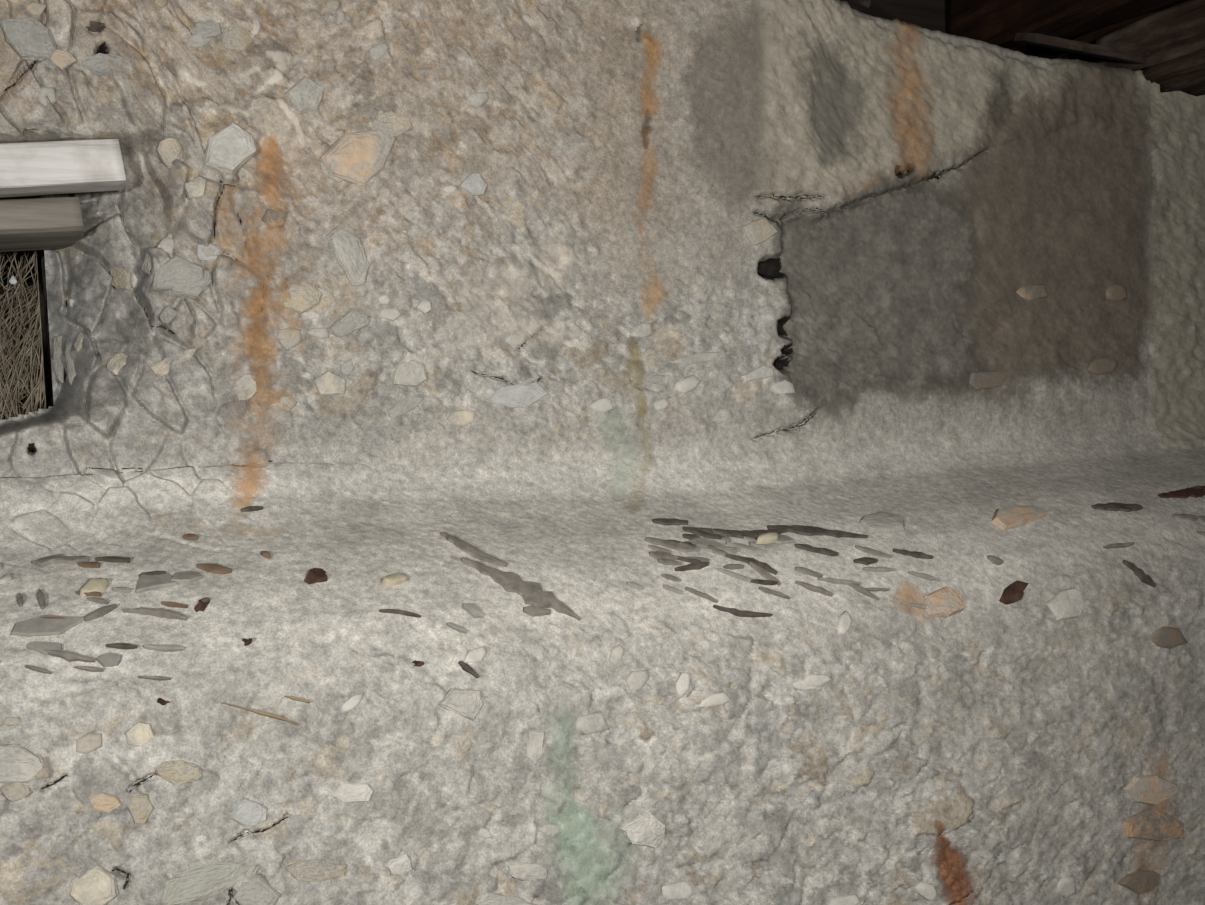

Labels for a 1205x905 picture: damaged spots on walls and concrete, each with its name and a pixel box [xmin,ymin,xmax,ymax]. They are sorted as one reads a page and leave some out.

rust [891,19,930,170]
spalling [754,0,1205,446]
rust [935,822,972,905]